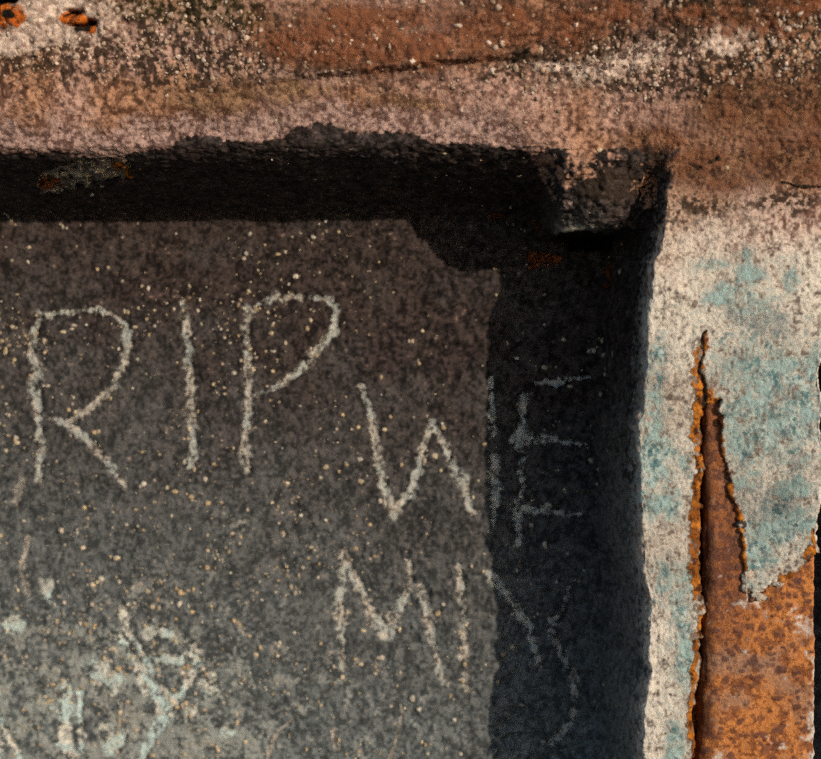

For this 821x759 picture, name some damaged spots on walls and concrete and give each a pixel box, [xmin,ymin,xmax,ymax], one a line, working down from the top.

corrosion [0,0,27,30]
corrosion [59,11,97,33]
corrosion [717,414,725,458]
peeling [703,248,821,603]
corrosion [686,332,721,757]
corrosion [725,470,749,575]
corrosion [779,528,816,583]